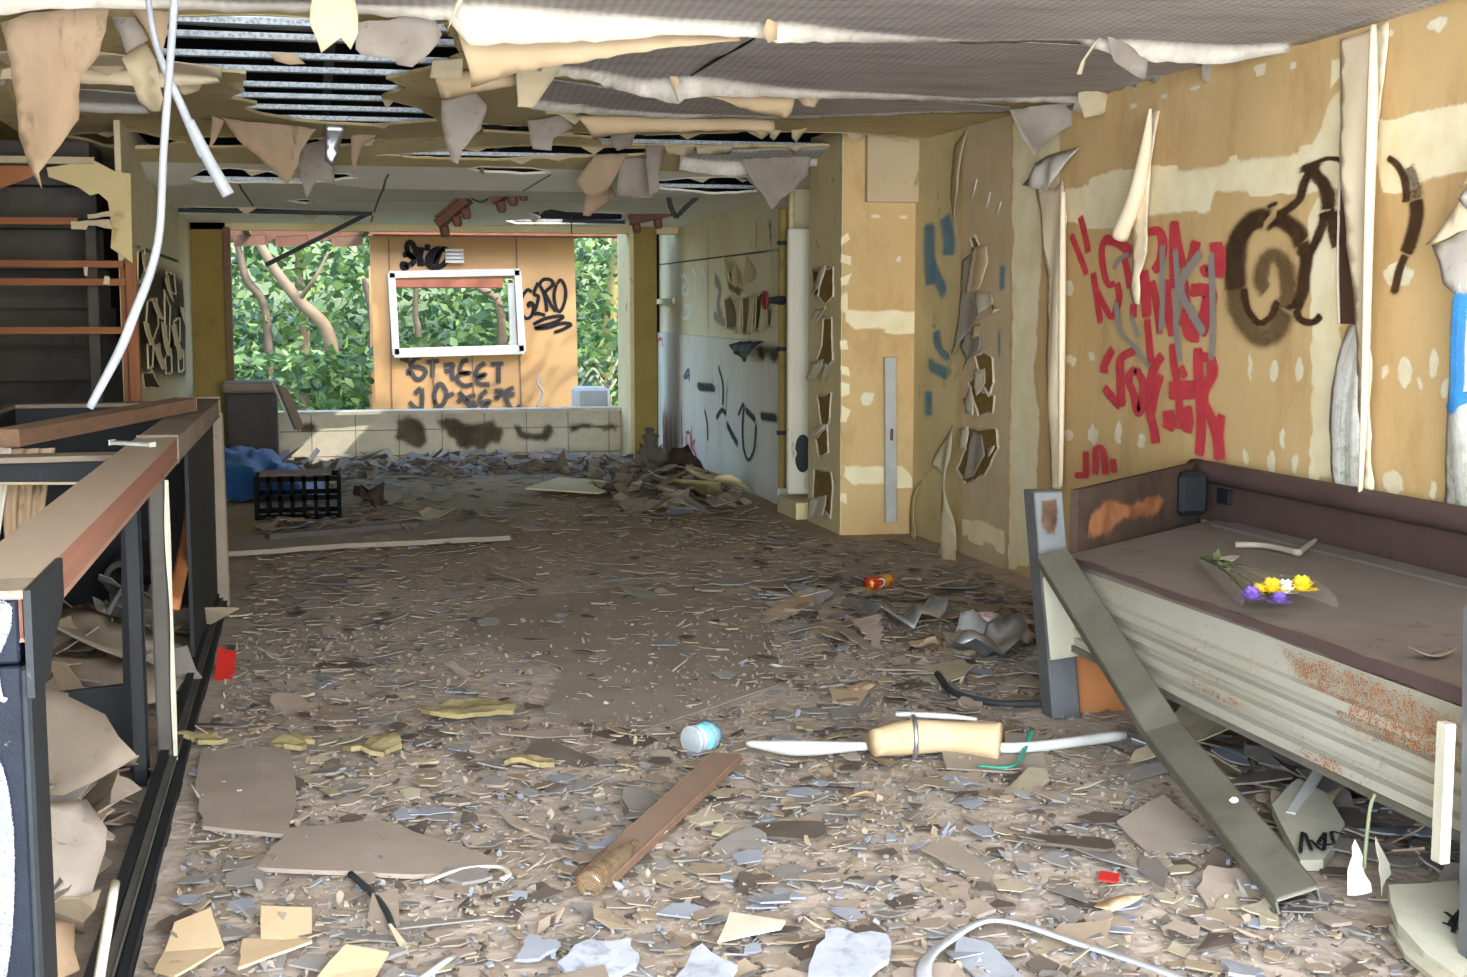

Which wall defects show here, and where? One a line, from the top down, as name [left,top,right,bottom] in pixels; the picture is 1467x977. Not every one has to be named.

peeling [962,115,1011,569]
corrosion [1274,645,1461,776]